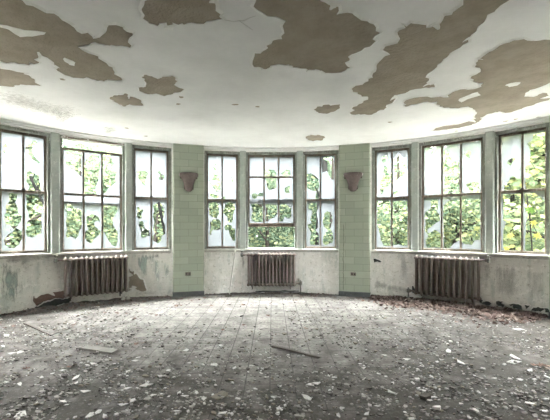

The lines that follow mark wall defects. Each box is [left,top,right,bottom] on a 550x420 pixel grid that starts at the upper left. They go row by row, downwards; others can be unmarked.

peeling [138,0,226,31]
peeling [0,0,136,87]
peeling [250,0,384,75]
peeling [348,0,550,132]
peeling [109,74,185,107]
peeling [313,104,341,114]
flaking render [128,266,148,293]
flaking render [31,289,70,308]